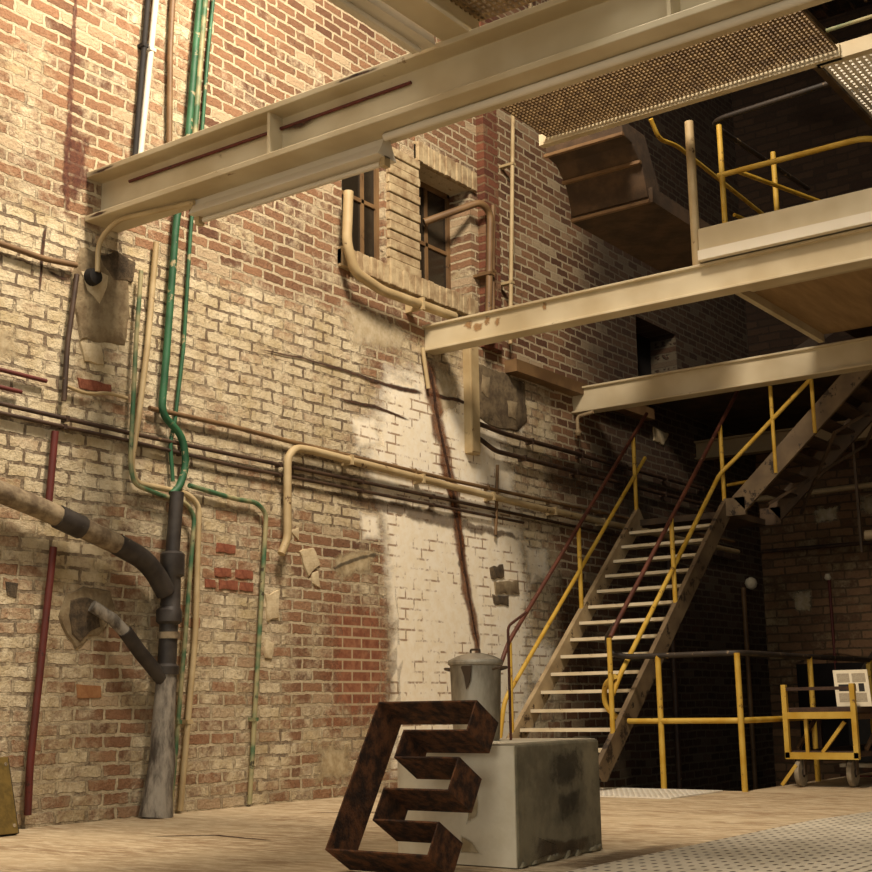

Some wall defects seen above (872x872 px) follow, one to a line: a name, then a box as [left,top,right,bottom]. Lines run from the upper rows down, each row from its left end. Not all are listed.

spalling [70,247,136,365]
peeling [328,364,554,738]
spalling [58,586,115,649]
peeling [391,725,453,774]